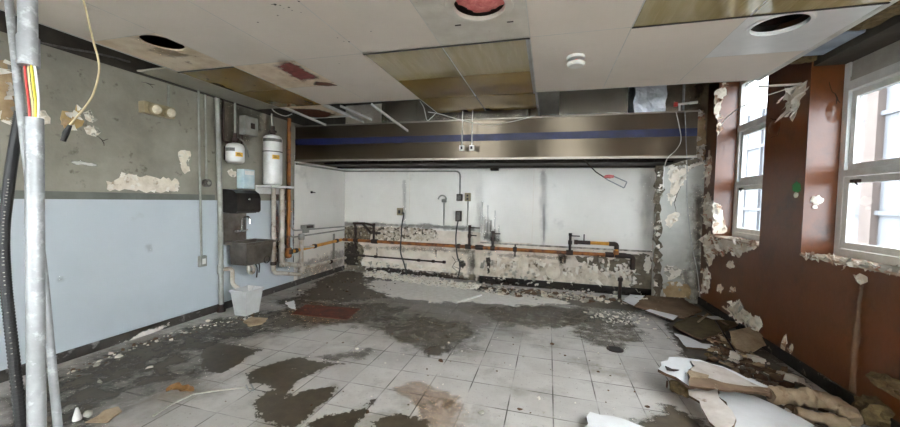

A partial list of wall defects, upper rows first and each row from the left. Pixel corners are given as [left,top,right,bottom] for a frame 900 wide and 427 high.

peeling [0,59,15,125]
peeling [40,105,102,136]
water stain [277,63,317,81]
peeling [775,81,809,122]
peeling [106,150,191,193]
peeling [480,82,763,332]
spalling [343,225,468,279]
peeling [801,251,900,285]